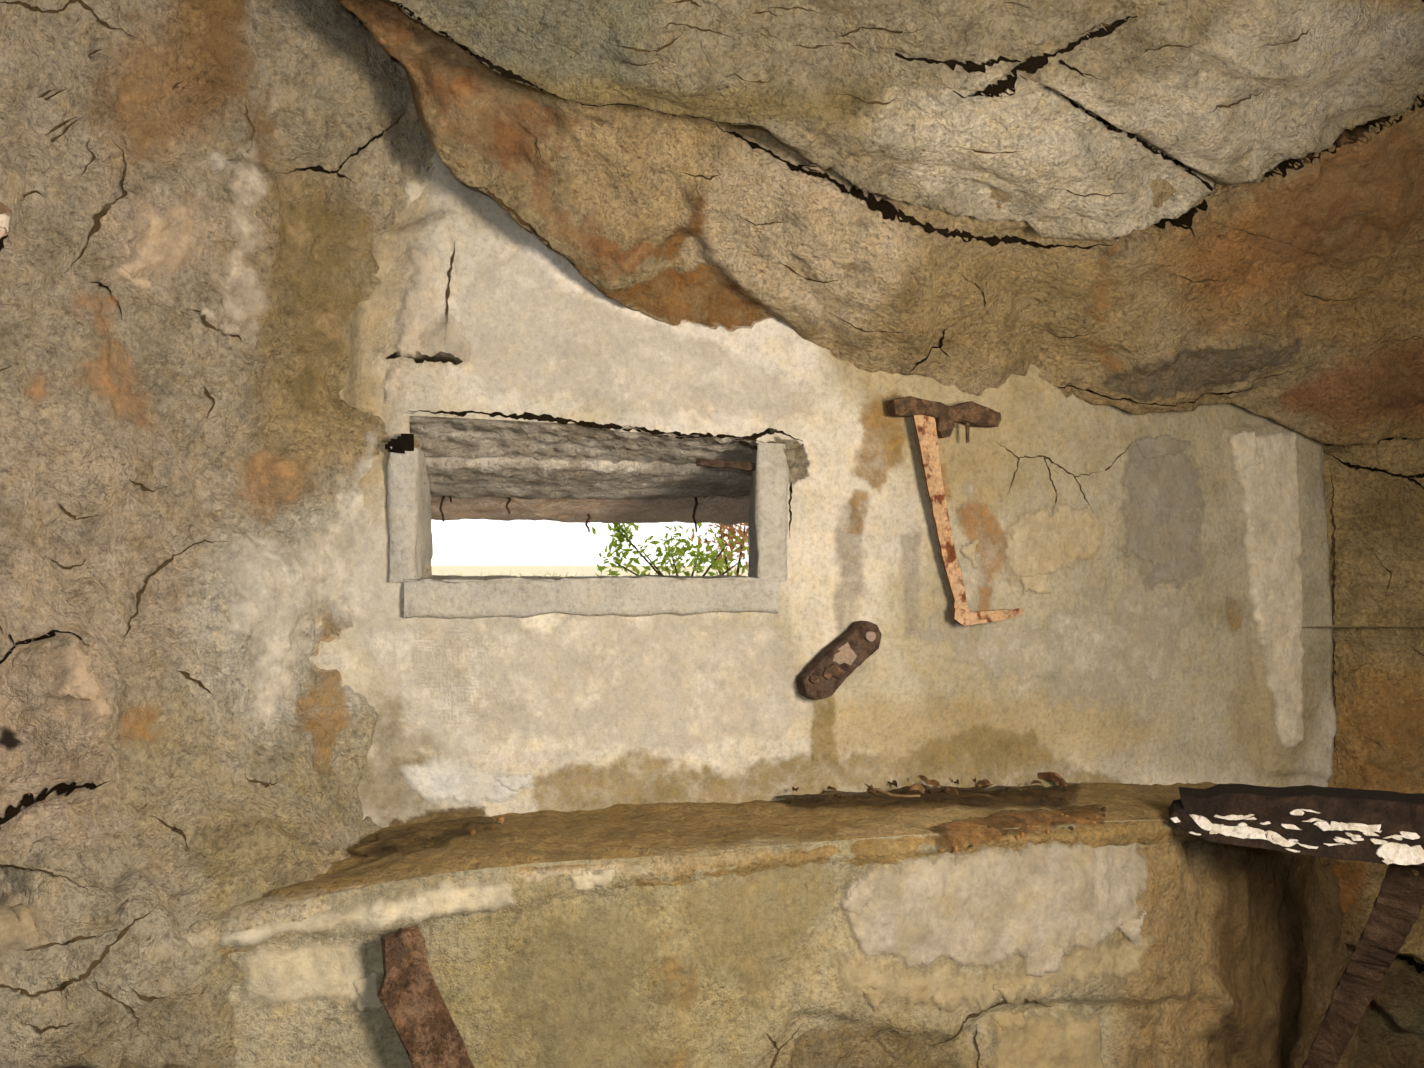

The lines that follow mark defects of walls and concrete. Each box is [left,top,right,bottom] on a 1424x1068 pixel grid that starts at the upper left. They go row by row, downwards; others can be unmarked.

crack [215,102,408,183]
crack [360,0,1127,314]
crack [617,0,1360,301]
crack [1261,95,1424,182]
crack [1324,438,1424,766]
crack [0,781,109,825]
crack [0,864,87,889]
crack [1395,955,1424,974]